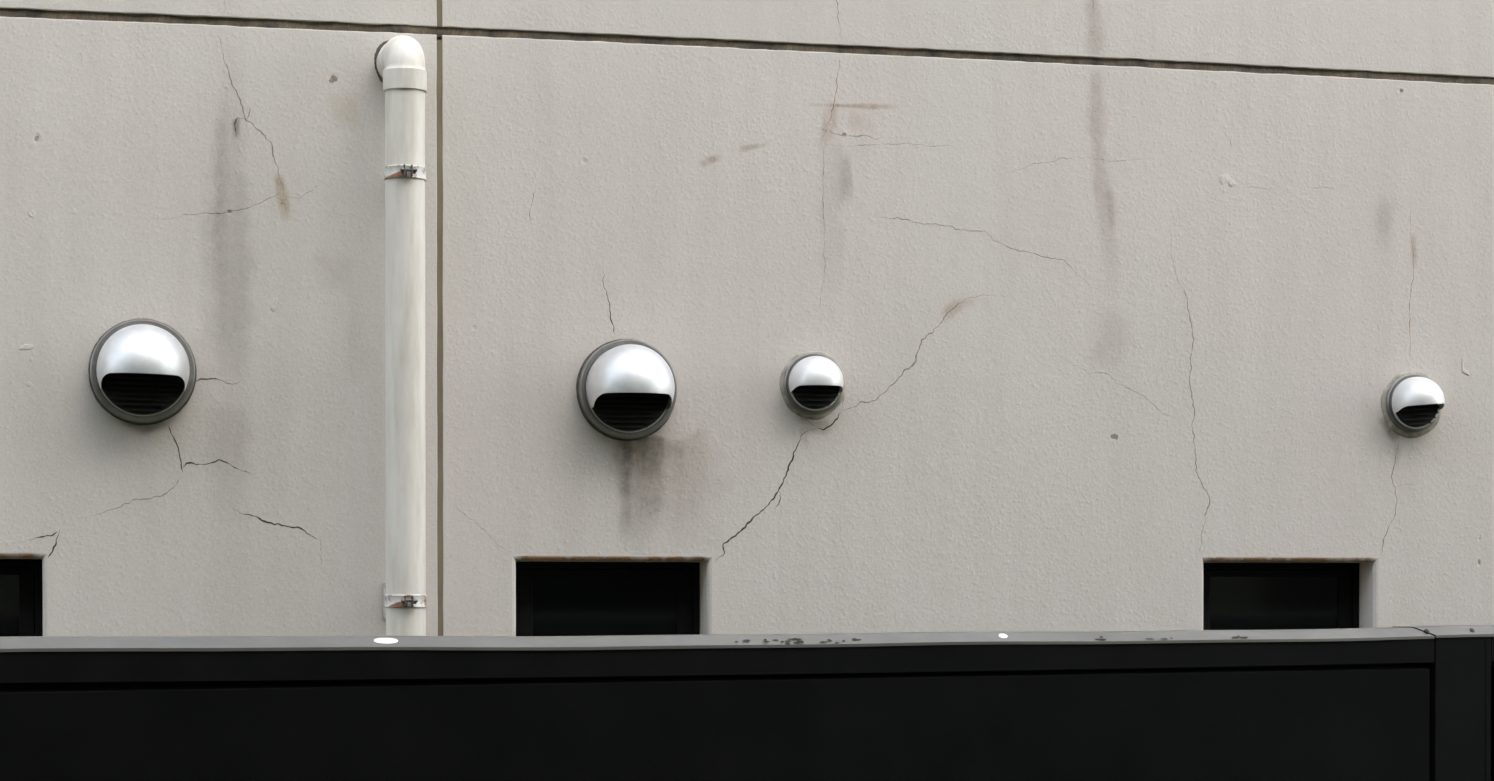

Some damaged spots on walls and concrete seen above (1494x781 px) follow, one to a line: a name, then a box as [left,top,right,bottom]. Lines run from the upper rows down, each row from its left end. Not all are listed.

crack [153,1,319,219]
crack [27,428,251,557]
crack [234,509,322,560]
crack [714,294,1011,563]
crack [1060,223,1210,548]
crack [1381,440,1416,553]